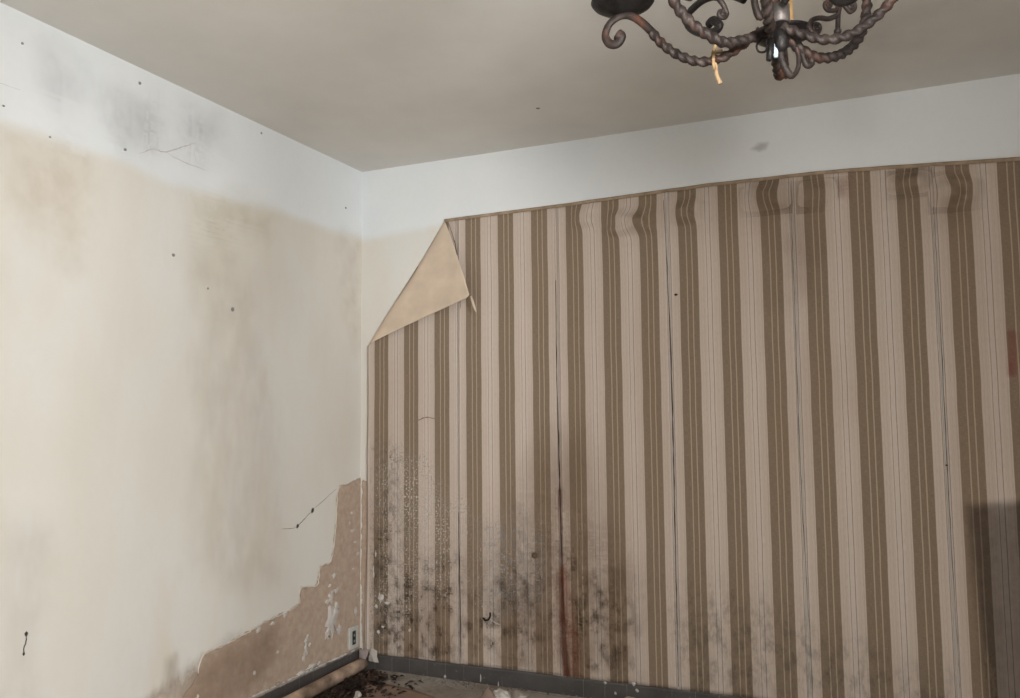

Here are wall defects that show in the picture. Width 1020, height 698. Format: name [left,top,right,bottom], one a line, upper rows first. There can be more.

peeling [369,221,469,344]
peeling [183,478,367,698]
water stain [372,459,545,656]